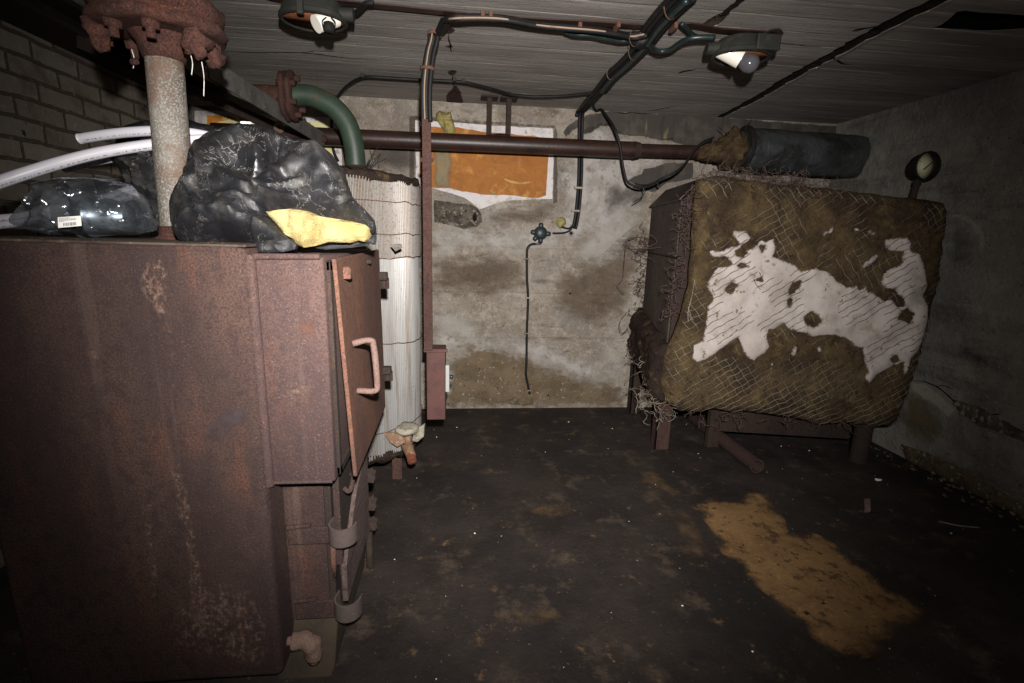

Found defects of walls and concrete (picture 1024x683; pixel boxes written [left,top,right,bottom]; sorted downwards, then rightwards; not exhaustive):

crack [718,0,955,117]
damp [437,336,457,349]
damp [514,343,594,374]
crack [913,380,955,402]